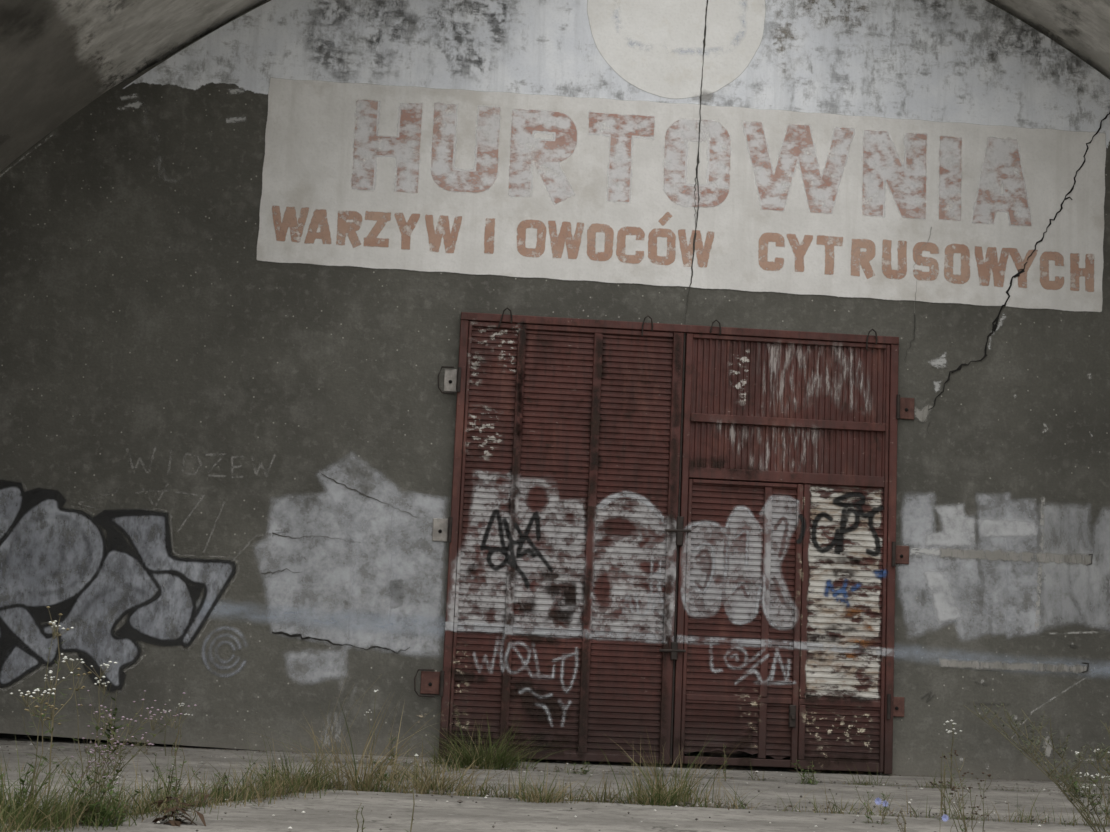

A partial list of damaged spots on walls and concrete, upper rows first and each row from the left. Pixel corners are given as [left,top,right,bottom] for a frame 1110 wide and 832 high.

water stain [447,0,504,42]
water stain [805,0,866,26]
water stain [1009,19,1080,76]
crack [685,0,708,319]
crack [927,112,1110,434]
crack [272,631,410,653]